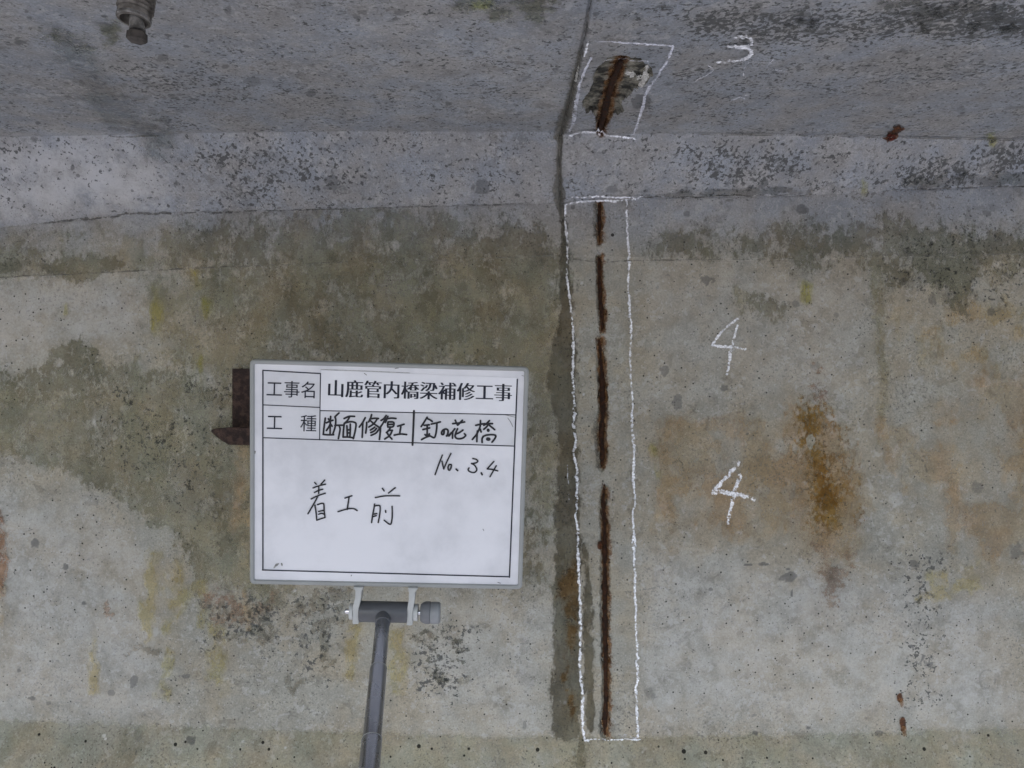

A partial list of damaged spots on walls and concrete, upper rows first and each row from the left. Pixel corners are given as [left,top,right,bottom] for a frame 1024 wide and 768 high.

spalling [582,55,653,138]
corrosion [883,125,904,143]
crack [35,203,520,224]
water stain [0,208,1024,768]
corrosion [652,362,865,608]
corrosion [897,693,907,736]